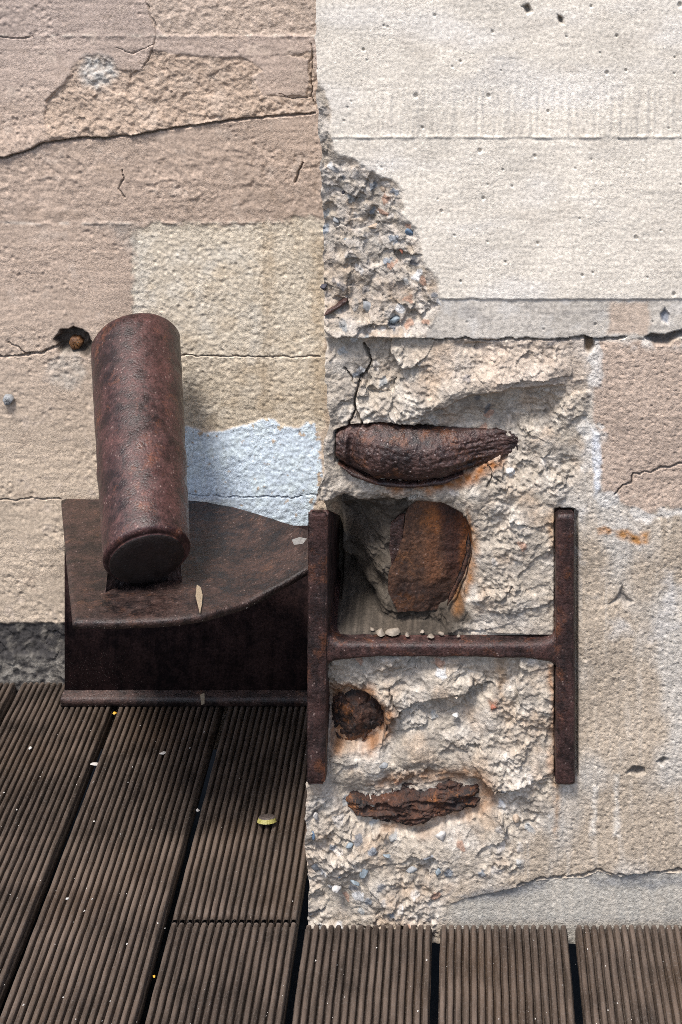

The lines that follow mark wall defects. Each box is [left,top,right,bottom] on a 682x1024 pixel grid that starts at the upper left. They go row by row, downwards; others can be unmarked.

crack [0,43,317,160]
peeling [44,51,592,635]
crack [344,342,373,423]
hole [584,338,596,356]
corrosion [382,454,509,498]
crack [614,462,682,496]
corrosion [450,507,482,621]
corrosion [327,681,401,763]
corrosion [544,663,563,840]
spalling [305,656,553,943]
corrosion [366,765,499,842]
crack [517,867,682,887]